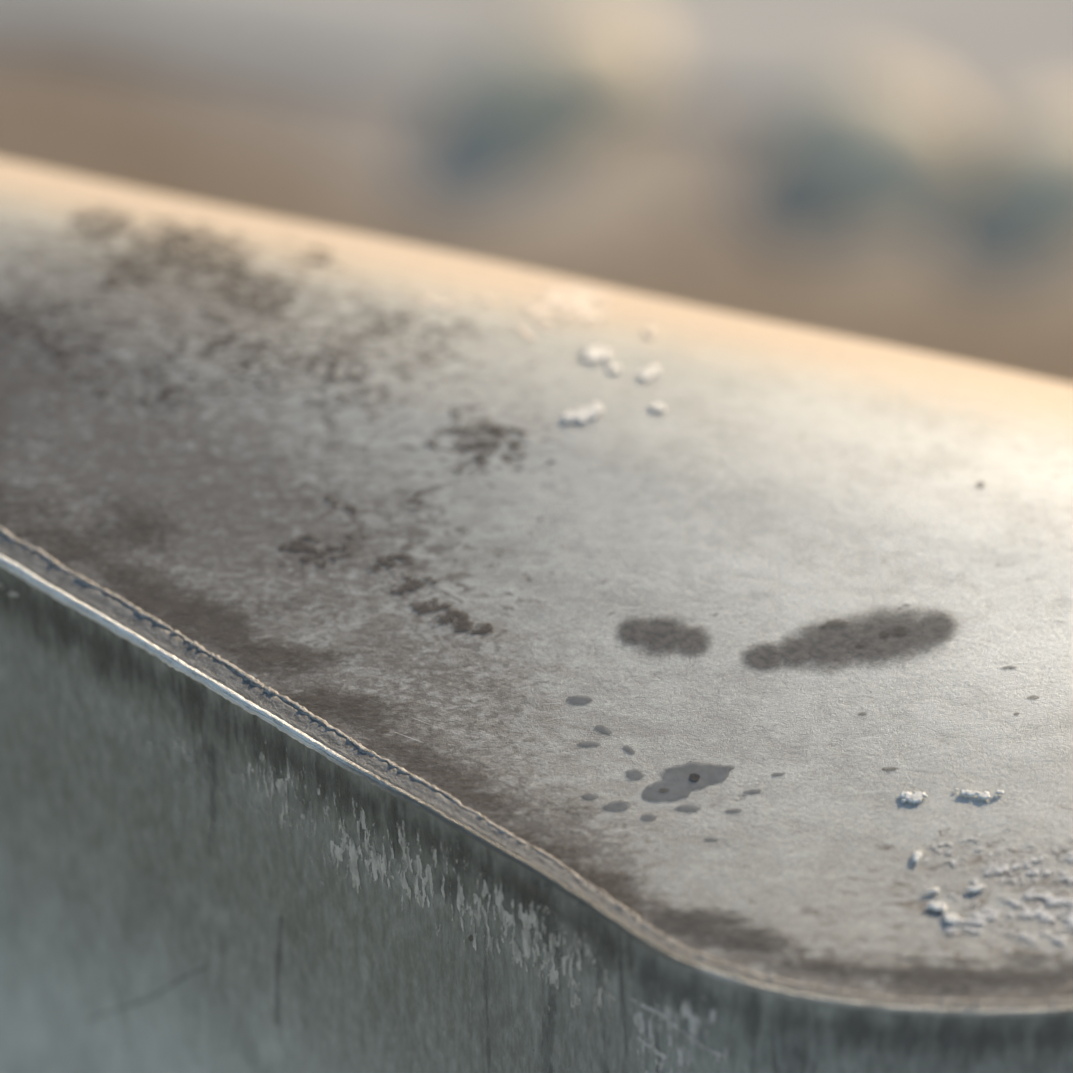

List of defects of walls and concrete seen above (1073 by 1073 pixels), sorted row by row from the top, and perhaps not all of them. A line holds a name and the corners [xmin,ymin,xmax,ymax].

leakage [619,618,708,654]
leakage [745,611,955,669]
leakage [567,695,592,704]
leakage [578,725,612,747]
leakage [583,794,629,811]
leakage [626,761,734,821]
peeling [898,791,927,804]
peeling [954,788,1004,800]
peeling [243,742,616,1021]
peeling [901,821,1073,958]
peeling [634,995,716,1073]